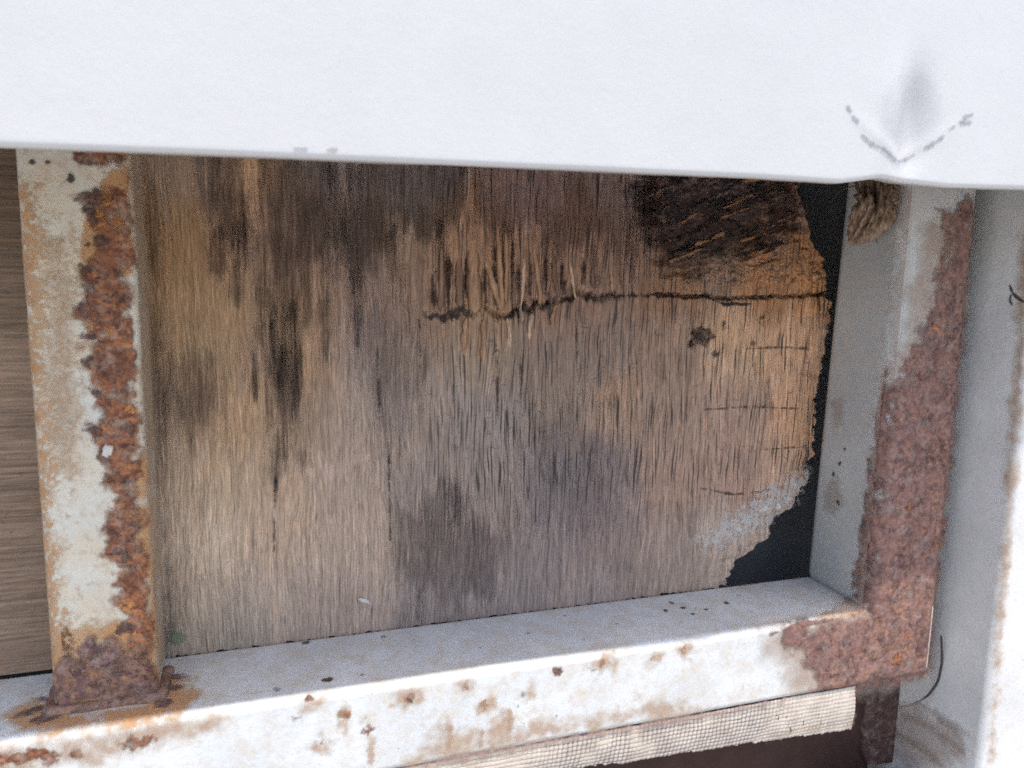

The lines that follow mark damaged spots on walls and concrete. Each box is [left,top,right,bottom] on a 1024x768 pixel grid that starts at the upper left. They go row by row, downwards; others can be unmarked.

rust [0,152,201,768]
crack [419,291,826,330]
peeling [721,179,758,219]
rust [770,195,974,695]